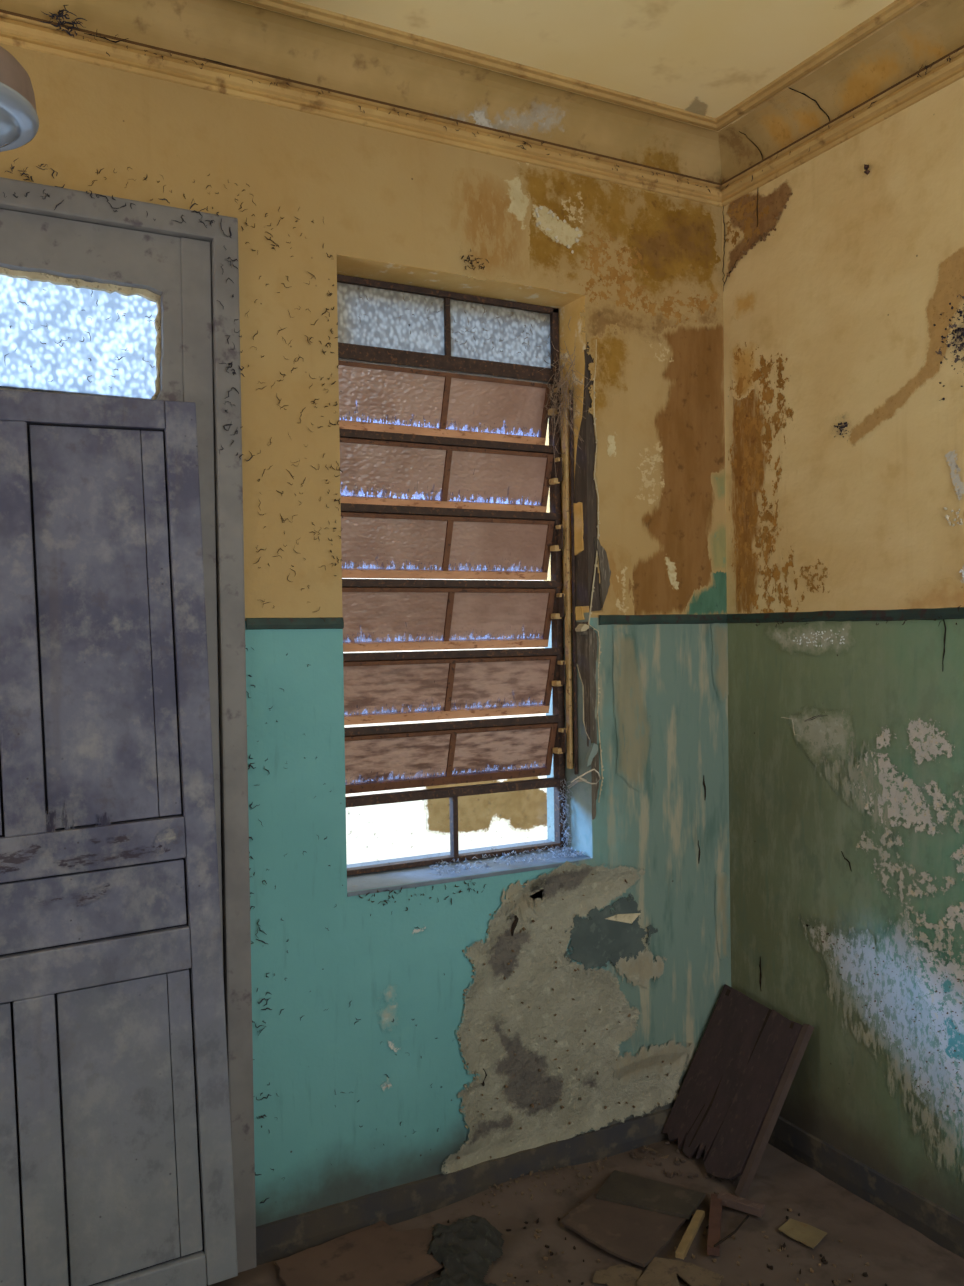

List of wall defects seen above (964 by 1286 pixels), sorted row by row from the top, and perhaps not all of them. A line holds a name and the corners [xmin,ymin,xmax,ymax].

damp [684,96,709,116]
crack [789,88,830,122]
damp [718,0,952,172]
peeling [503,162,584,254]
damp [451,161,723,346]
peeling [723,178,793,277]
damp [847,245,964,448]
damp [707,521,727,573]
spalling [441,861,693,1175]
peeling [781,704,964,1185]